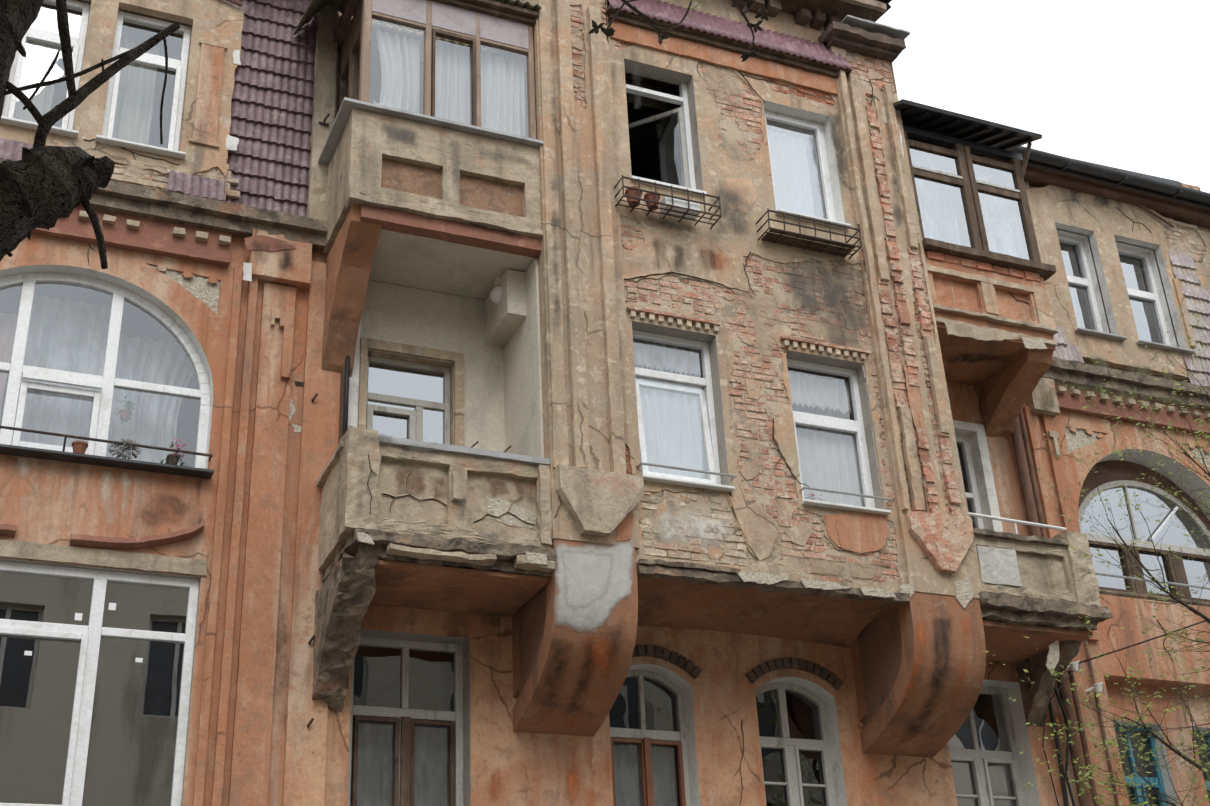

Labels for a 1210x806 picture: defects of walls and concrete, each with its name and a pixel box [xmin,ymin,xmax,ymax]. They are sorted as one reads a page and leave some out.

peeling [233,50,241,66]
flaking render [570,6,586,108]
flaking render [698,62,836,161]
flaking render [845,51,904,157]
flaking render [111,159,182,194]
flaking render [193,135,240,200]
flaking render [150,265,220,314]
flaking render [616,176,1047,602]
crack [367,454,447,514]
crack [473,496,562,525]
crack [773,418,809,487]
peeling [954,578,974,609]